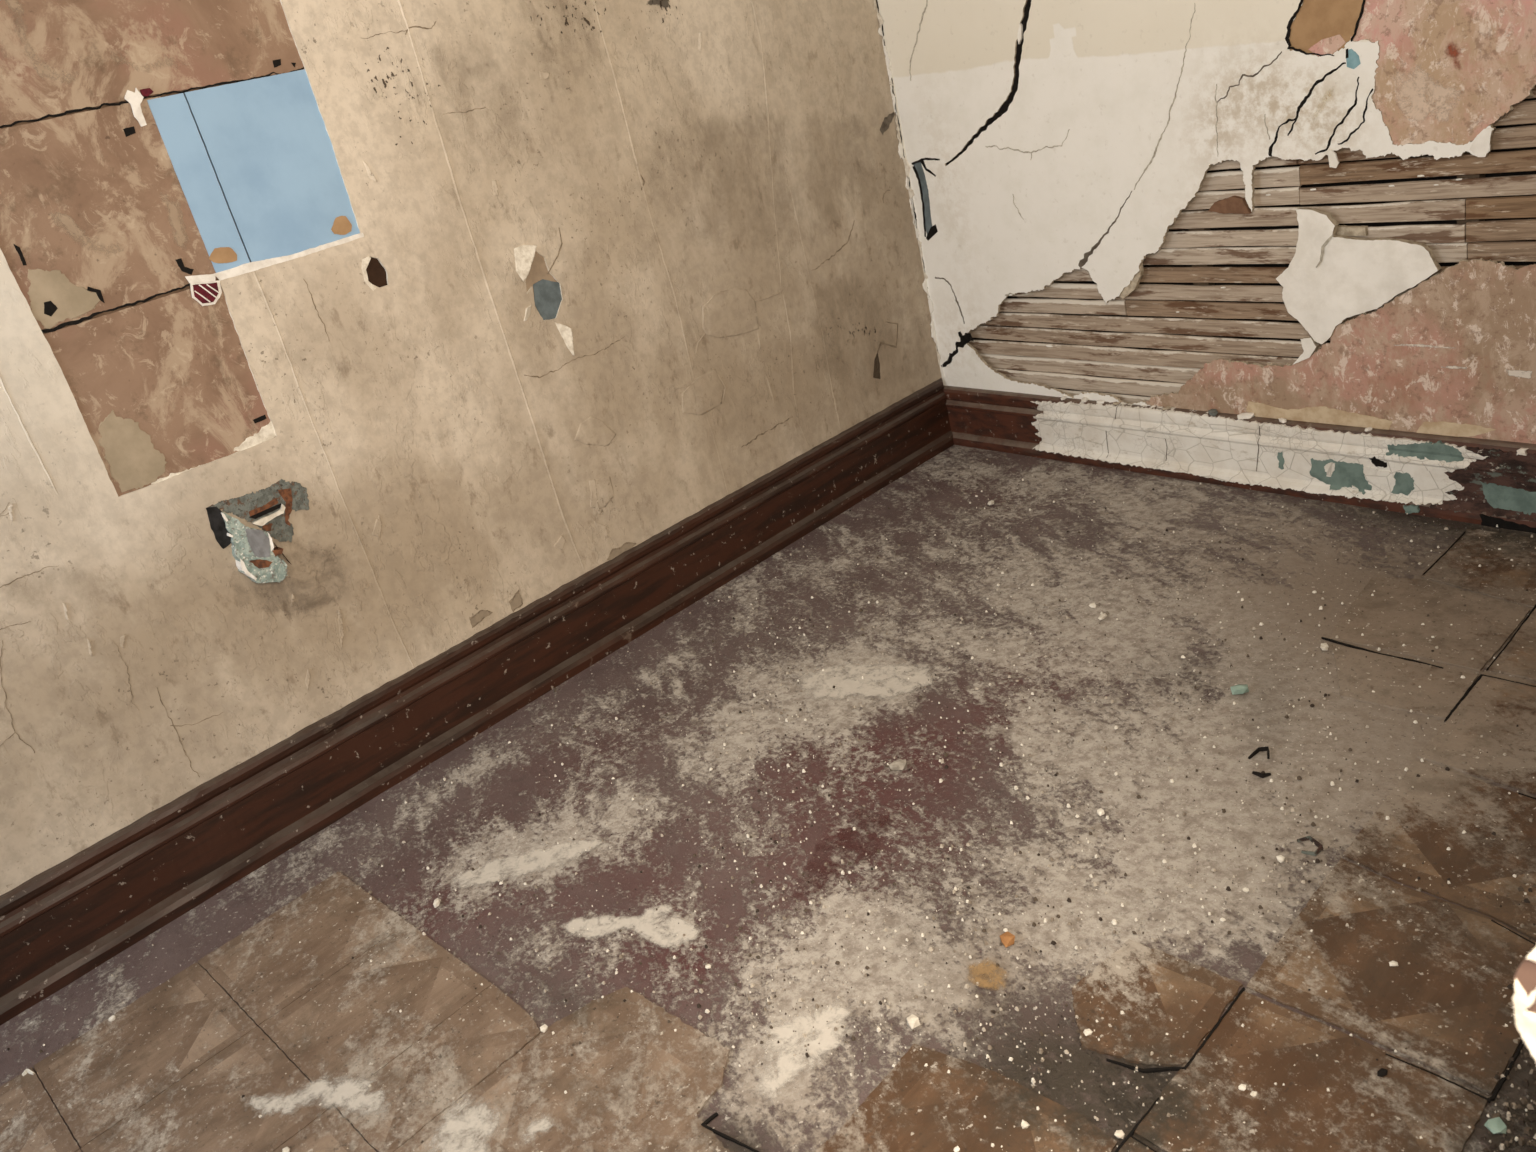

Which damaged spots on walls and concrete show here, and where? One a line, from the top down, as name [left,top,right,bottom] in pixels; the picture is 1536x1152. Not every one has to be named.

damp [530,1,606,39]
crack [909,0,928,81]
crack [946,0,1070,165]
crack [1078,3,1282,268]
crack [1264,62,1373,156]
peeling [0,0,304,497]
peeling [331,216,352,235]
spalling [362,256,387,291]
peeling [514,228,575,356]
crack [935,277,973,367]
flaking render [968,0,1536,522]
spalling [206,507,257,580]